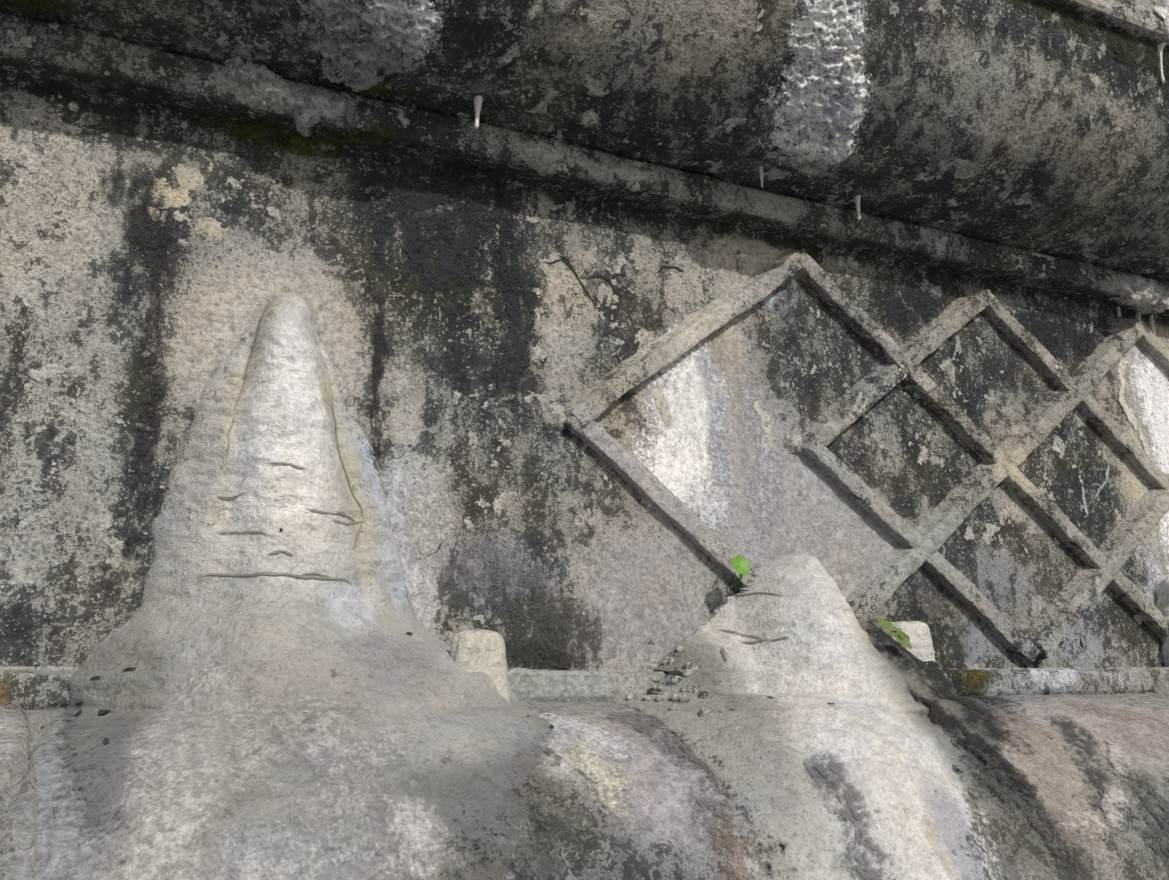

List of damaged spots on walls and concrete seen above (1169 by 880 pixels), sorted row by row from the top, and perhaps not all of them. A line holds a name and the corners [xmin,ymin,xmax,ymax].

crack [227,304,269,456]
crack [197,531,353,584]
crack [269,461,308,469]
crack [307,398,364,549]
damp [52,158,1169,880]